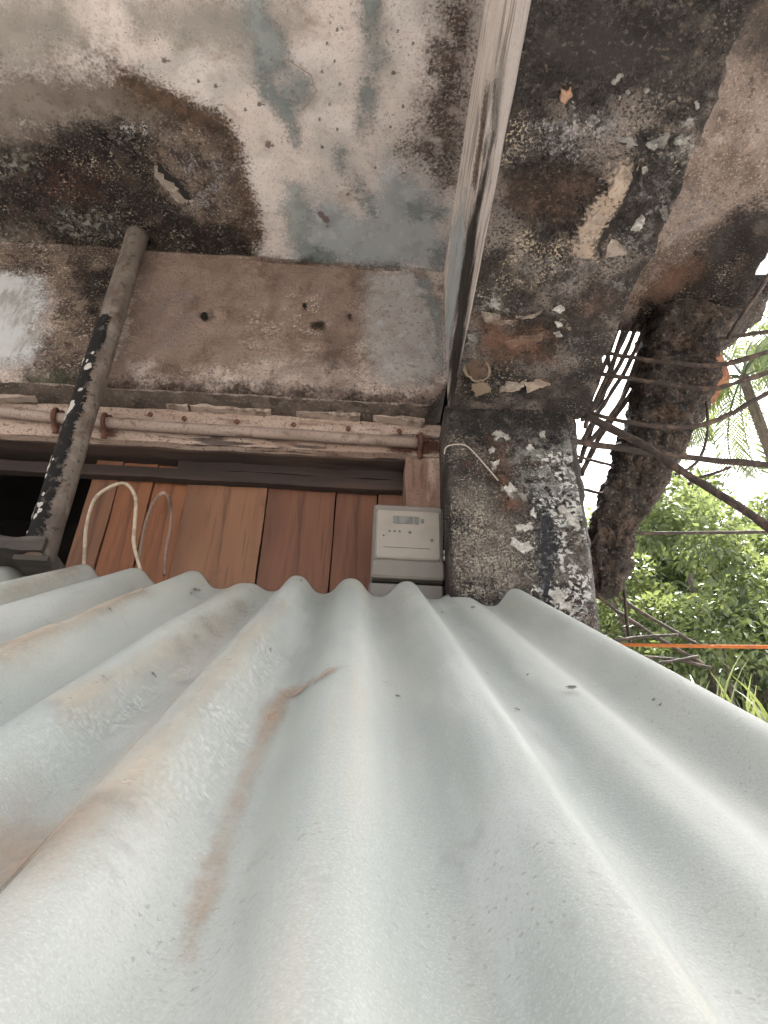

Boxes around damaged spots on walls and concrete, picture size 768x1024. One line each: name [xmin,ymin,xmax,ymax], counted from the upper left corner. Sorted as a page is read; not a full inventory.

spalling [154,162,191,204]
damp [0,0,553,406]
damp [499,159,598,229]
peeling [567,100,700,269]
peeling [481,305,565,343]
peeling [499,379,550,393]
peeling [488,430,510,470]
spalling [557,285,768,669]
peeling [501,482,537,554]